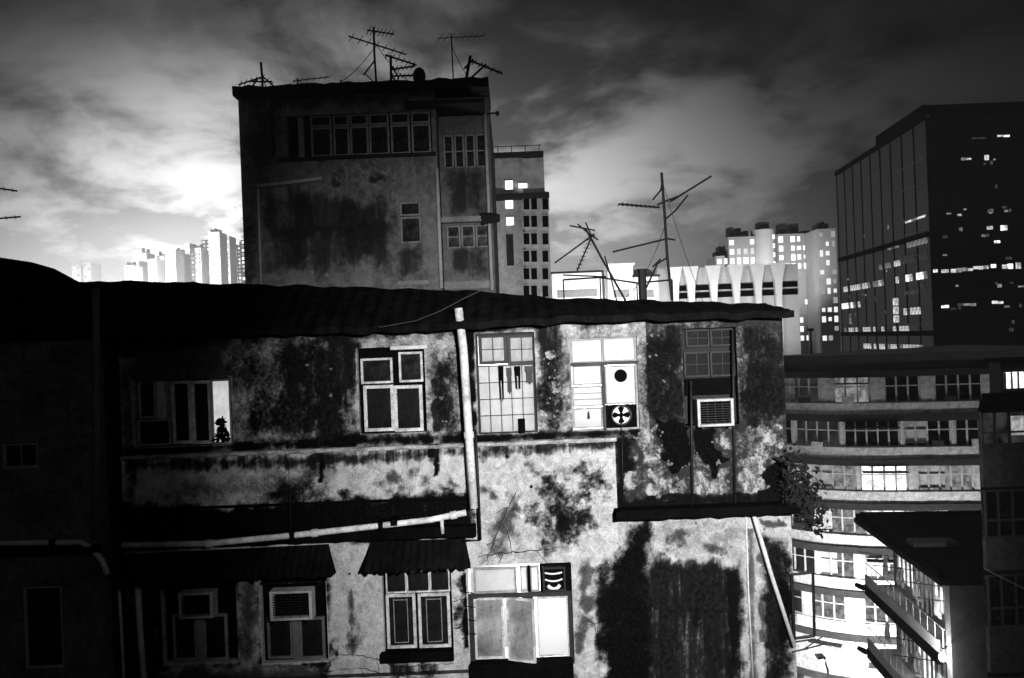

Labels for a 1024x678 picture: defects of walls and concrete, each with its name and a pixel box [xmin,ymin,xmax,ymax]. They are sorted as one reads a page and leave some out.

damp [263,187,396,280]
damp [448,169,484,215]
damp [453,249,486,275]
damp [117,323,786,557]
crack [478,492,558,564]
damp [575,520,747,678]